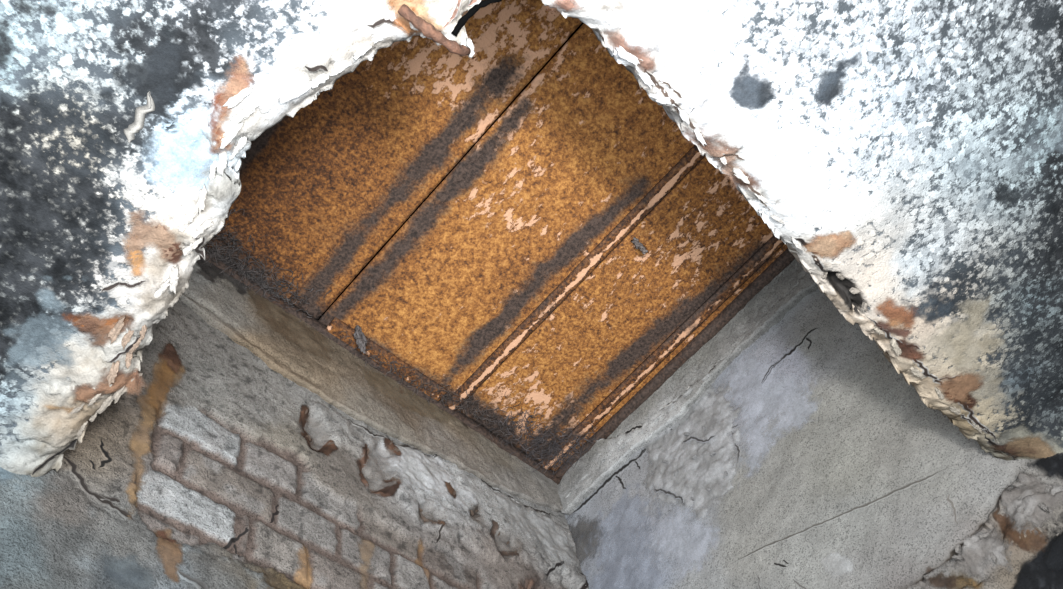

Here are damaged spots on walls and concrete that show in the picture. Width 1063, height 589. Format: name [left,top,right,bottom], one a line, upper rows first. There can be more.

water stain [114,38,219,194]
corrosion [607,32,655,71]
peeling [615,45,707,146]
mould [817,54,861,105]
peeling [154,36,383,298]
corrosion [688,133,759,188]
spalling [821,270,868,315]
corrosion [877,300,923,360]
mould [910,285,954,322]
crack [866,316,1018,460]
crack [32,439,136,522]
crack [733,465,1011,589]